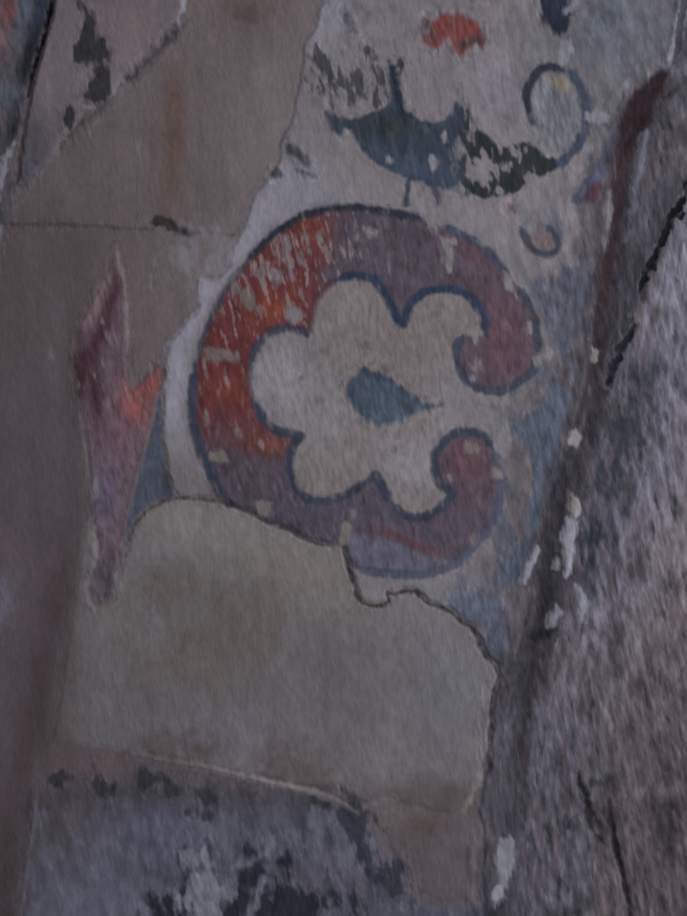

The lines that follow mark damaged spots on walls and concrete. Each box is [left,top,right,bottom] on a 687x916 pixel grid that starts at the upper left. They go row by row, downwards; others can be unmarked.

crack [23,0,58,100]
peeling [293,31,399,124]
peeling [555,34,577,71]
peeling [559,0,590,20]
peeling [404,126,460,276]
peeling [229,224,329,317]
peeling [281,298,309,331]
crack [601,170,687,390]
peeling [205,421,269,468]
peeling [251,496,282,536]